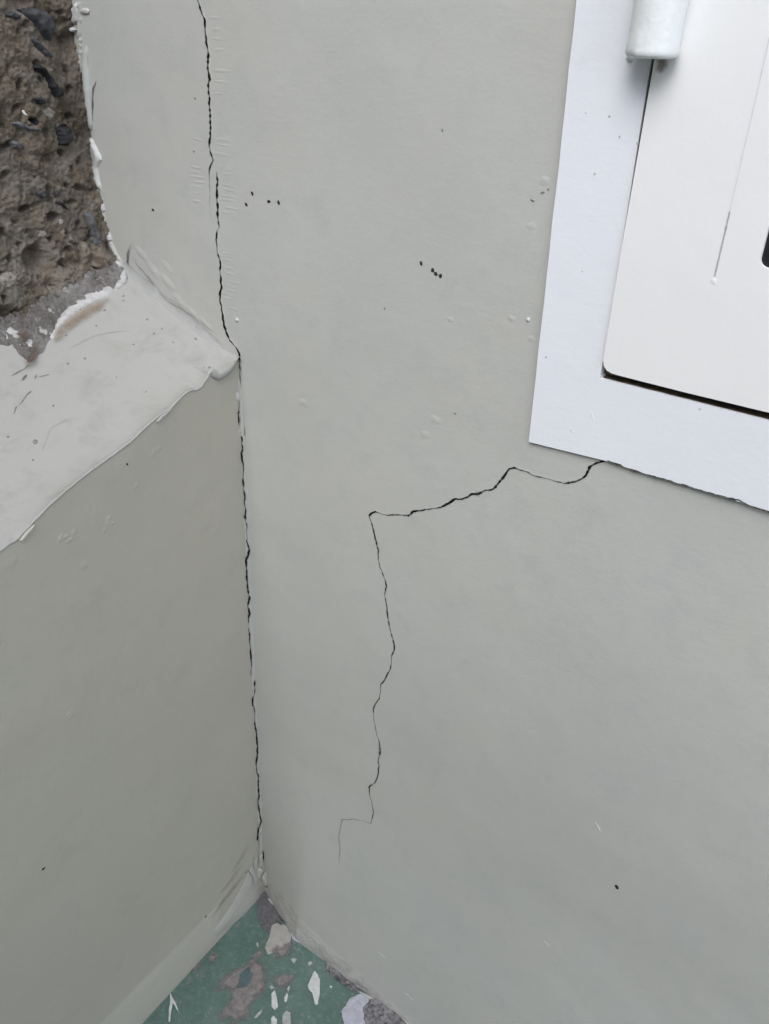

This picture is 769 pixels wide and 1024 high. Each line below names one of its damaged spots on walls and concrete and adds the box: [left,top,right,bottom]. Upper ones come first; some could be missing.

spalling [0,0,128,363]
crack [126,0,264,860]
crack [338,459,769,864]